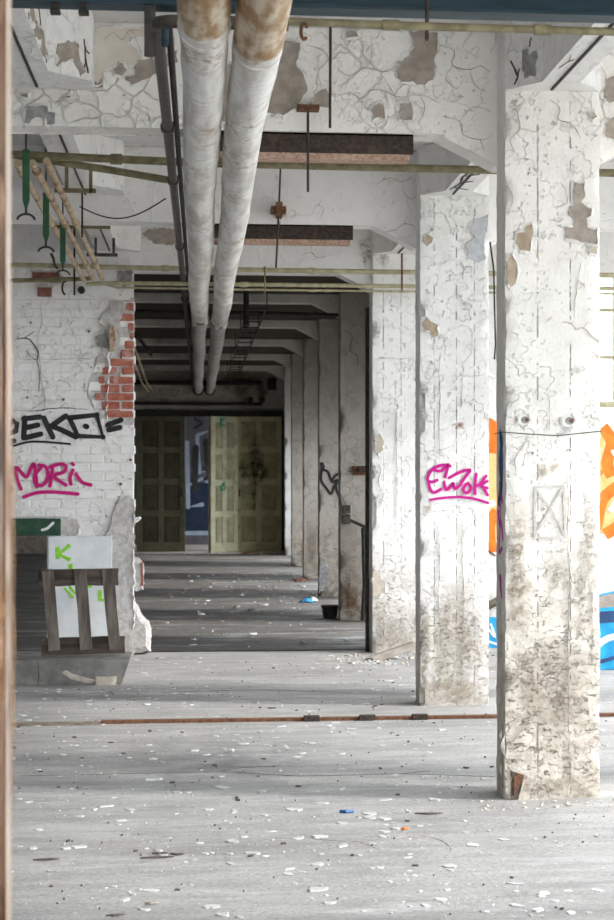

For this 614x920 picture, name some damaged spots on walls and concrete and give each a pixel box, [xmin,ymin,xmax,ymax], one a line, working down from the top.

peeling [28,9,156,89]
peeling [266,39,334,120]
peeling [394,30,440,87]
crack [308,45,580,160]
peeling [465,215,489,263]
peeling [504,222,534,290]
peeling [563,180,600,256]
crack [566,264,599,341]
spalling [86,298,135,425]